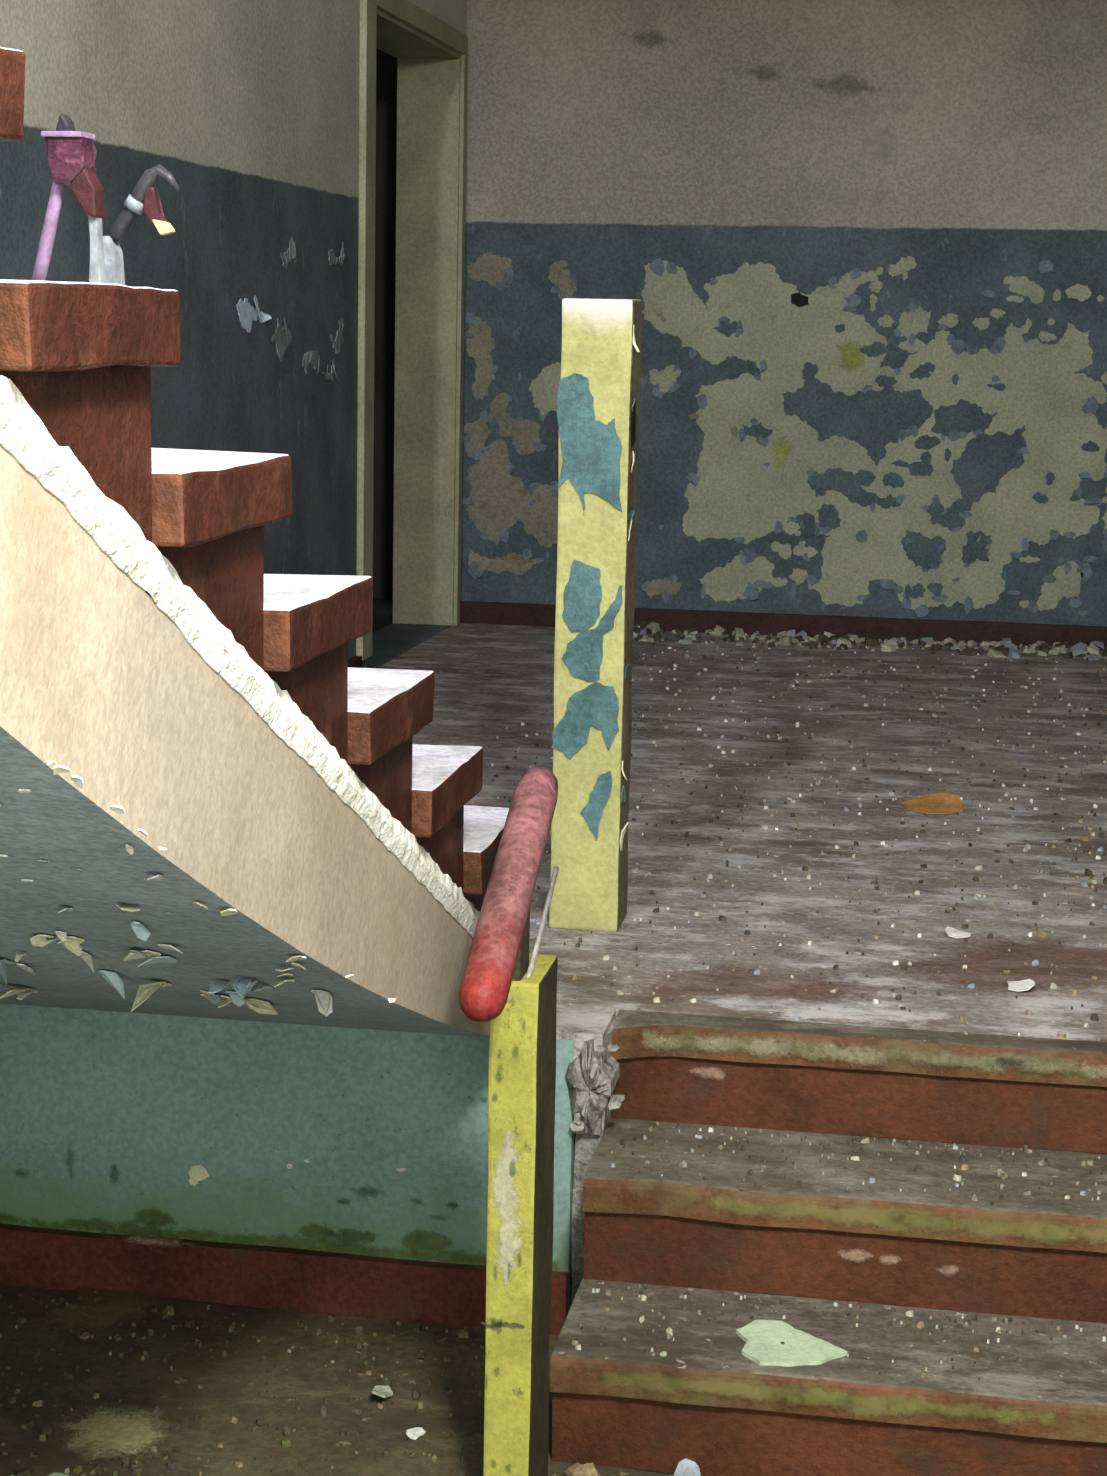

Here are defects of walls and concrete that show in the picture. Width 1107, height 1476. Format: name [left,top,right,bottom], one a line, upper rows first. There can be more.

peeling [467,252,513,290]
peeling [548,260,577,301]
peeling [236,295,344,380]
peeling [462,312,561,579]
peeling [632,256,1107,617]
damp [782,1042,836,1059]
damp [956,1054,1078,1073]
spalling [565,1038,625,1134]
damp [0,1210,486,1265]
damp [840,1207,952,1226]
damp [1018,1222,1070,1239]
damp [690,1380,780,1400]